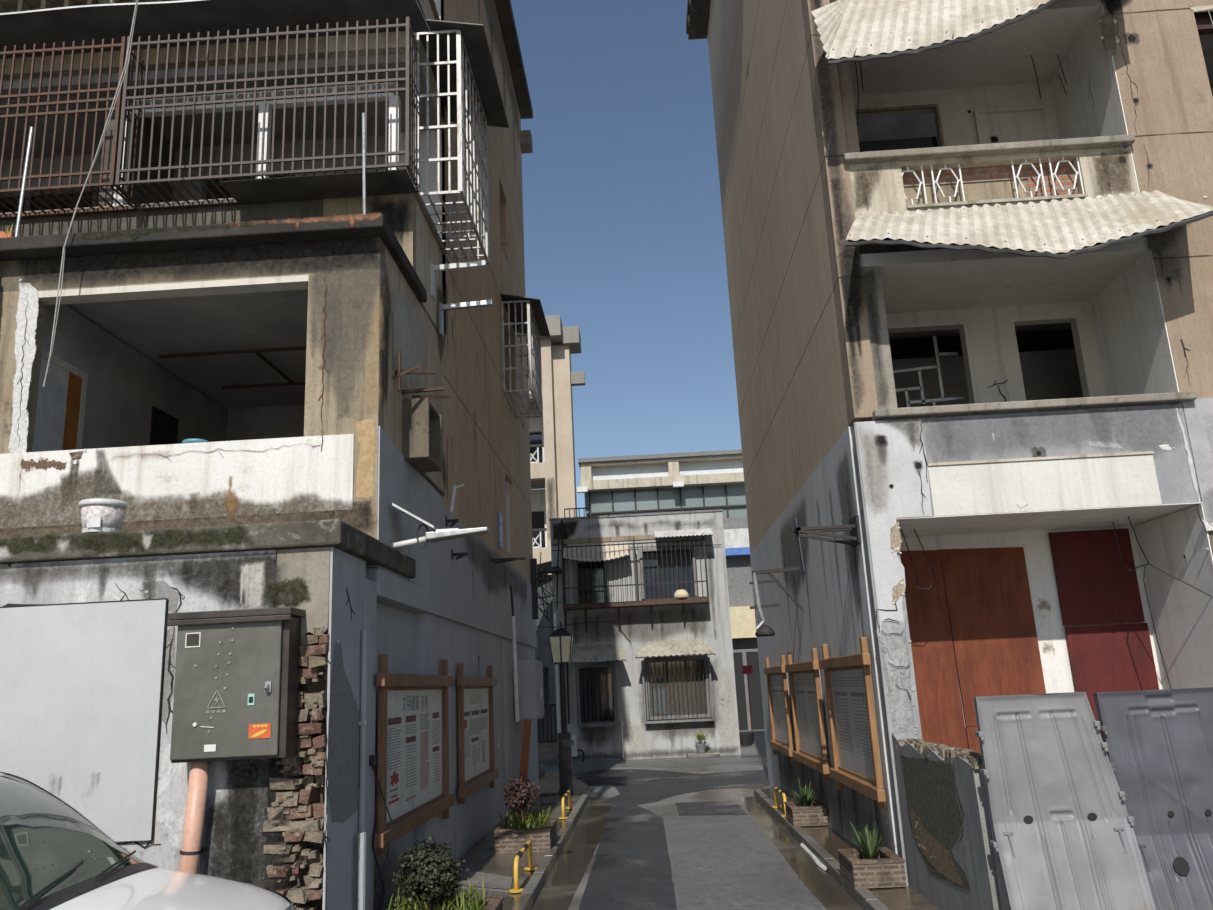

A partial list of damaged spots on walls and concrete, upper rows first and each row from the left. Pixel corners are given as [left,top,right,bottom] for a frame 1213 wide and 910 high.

leakage [834,181,842,233]
leakage [855,168,878,208]
leakage [1095,153,1130,194]
crack [117,275,329,462]
leakage [0,451,370,608]
spalling [890,521,902,554]
crack [919,423,928,513]
crack [1176,351,1213,532]
spalling [877,578,918,734]
spalling [263,628,360,910]
flaking render [900,755,970,891]